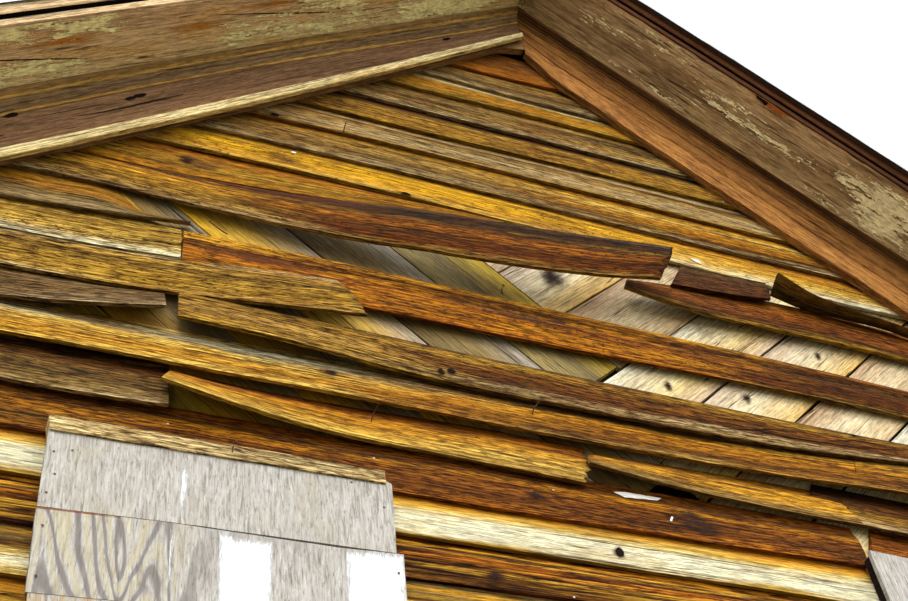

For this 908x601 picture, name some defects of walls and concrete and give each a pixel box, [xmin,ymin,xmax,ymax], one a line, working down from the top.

peeling [579,9,698,67]
peeling [609,60,818,172]
peeling [805,164,908,253]